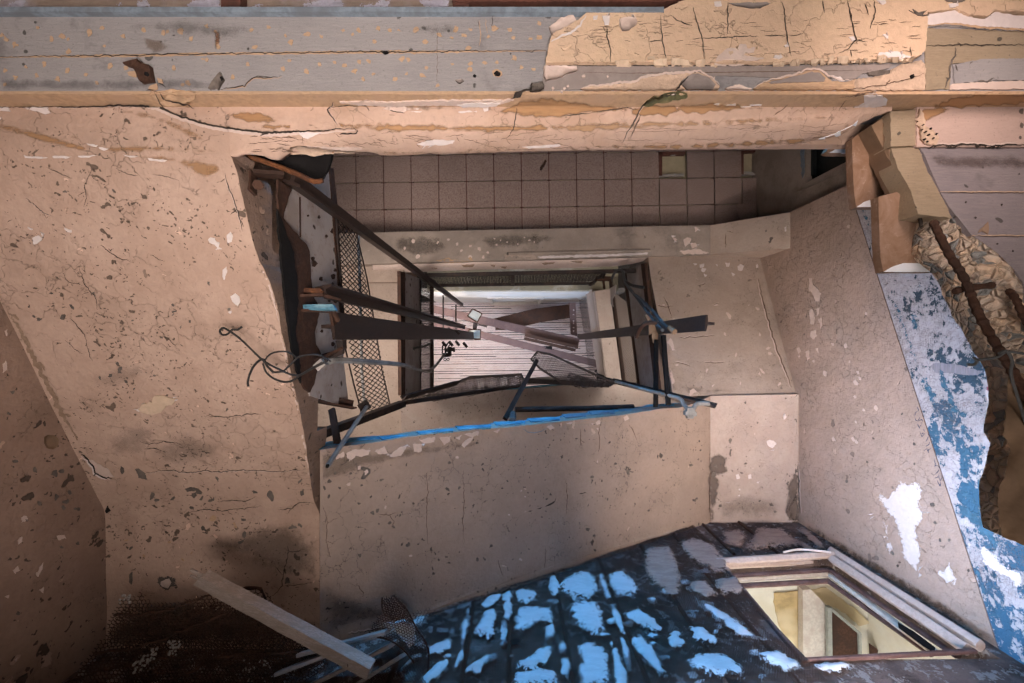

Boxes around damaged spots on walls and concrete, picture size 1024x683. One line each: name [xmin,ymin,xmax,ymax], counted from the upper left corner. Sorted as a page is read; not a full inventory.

peeling [340,84,514,113]
peeling [417,139,455,149]
crack [0,1,1021,152]
leakage [340,98,768,132]
spalling [413,0,1024,139]
crack [221,174,244,231]
spalling [911,215,1024,618]
crack [81,454,112,480]
peeling [323,431,479,498]
leakage [709,455,727,519]
leakage [786,474,799,521]
peeling [869,482,950,577]